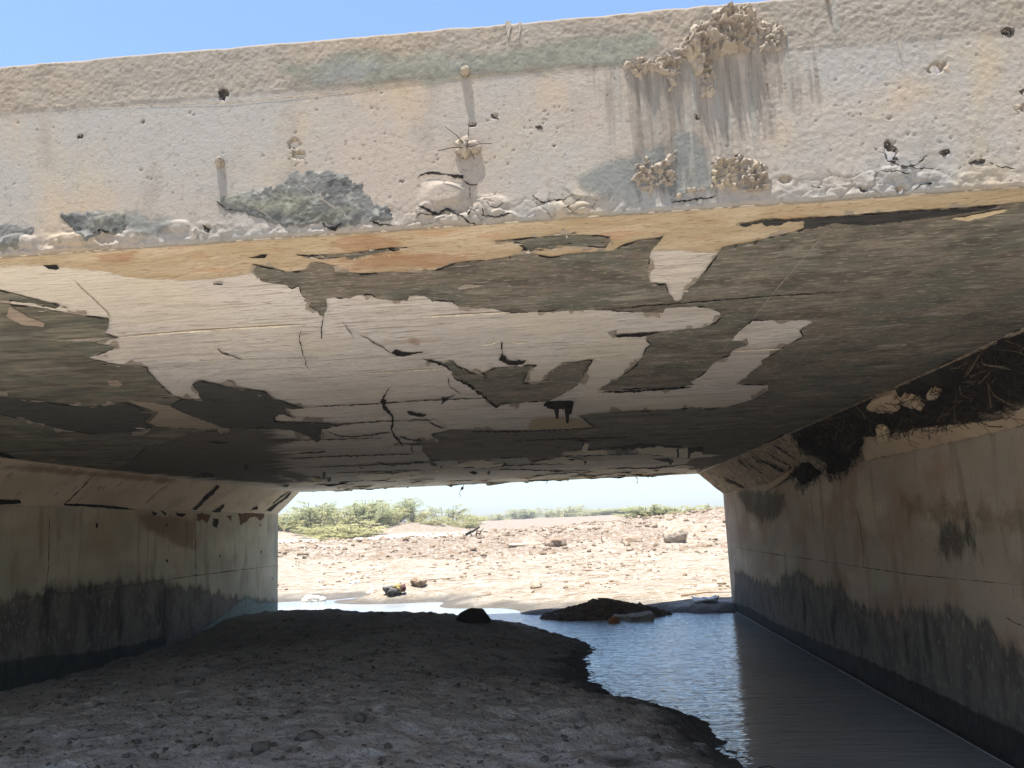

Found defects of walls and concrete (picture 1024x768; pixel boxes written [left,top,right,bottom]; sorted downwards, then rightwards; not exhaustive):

damp [282,34,820,203]
spalling [0,223,34,255]
spalling [60,210,128,241]
flaking render [0,290,354,470]
crack [267,378,492,483]
flaking render [248,202,1024,512]
damp [0,576,278,664]
damp [734,571,1024,768]